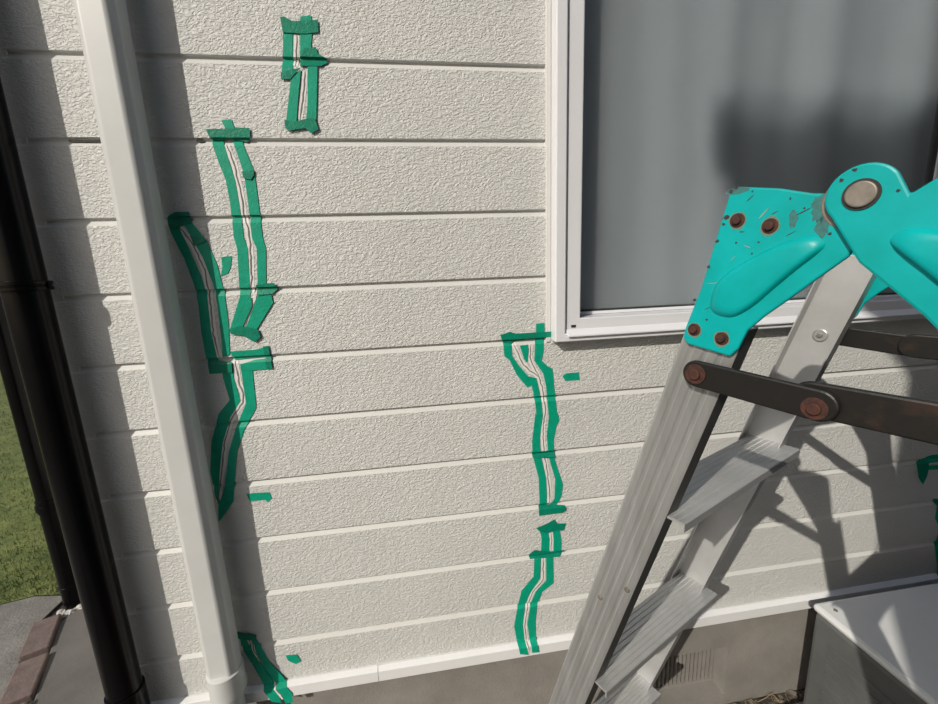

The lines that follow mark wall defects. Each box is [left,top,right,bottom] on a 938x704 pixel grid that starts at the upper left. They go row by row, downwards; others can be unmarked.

crack [295,35,305,116]
crack [226,145,257,326]
crack [179,227,244,502]
crack [514,345,550,502]
crack [524,537,552,648]